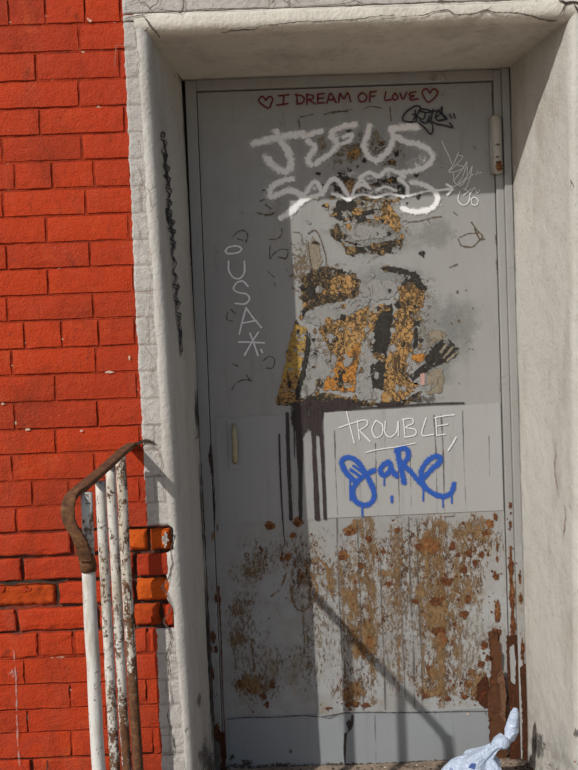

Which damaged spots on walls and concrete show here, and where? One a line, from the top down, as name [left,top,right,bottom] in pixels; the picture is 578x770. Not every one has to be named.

crack [115,0,578,74]
rust [210,502,528,770]